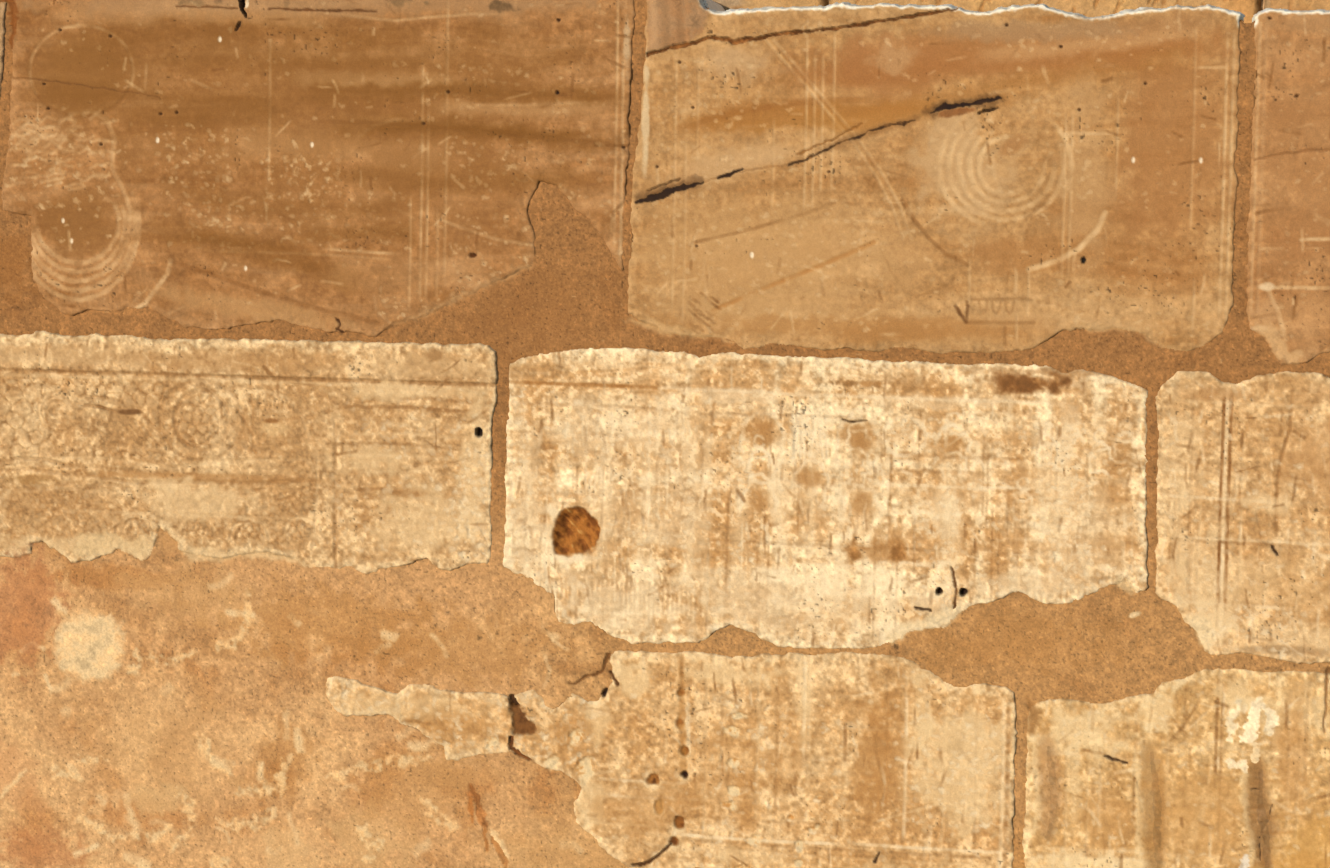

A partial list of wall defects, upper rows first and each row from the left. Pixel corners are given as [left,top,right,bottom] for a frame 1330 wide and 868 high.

crack [174,0,378,32]
crack [645,7,959,58]
crack [633,90,1006,205]
crack [1252,148,1330,163]
spalling [882,604,968,648]
crack [567,652,620,698]
spalling [504,694,538,762]
water stain [1134,736,1173,868]
water stain [1222,696,1283,868]